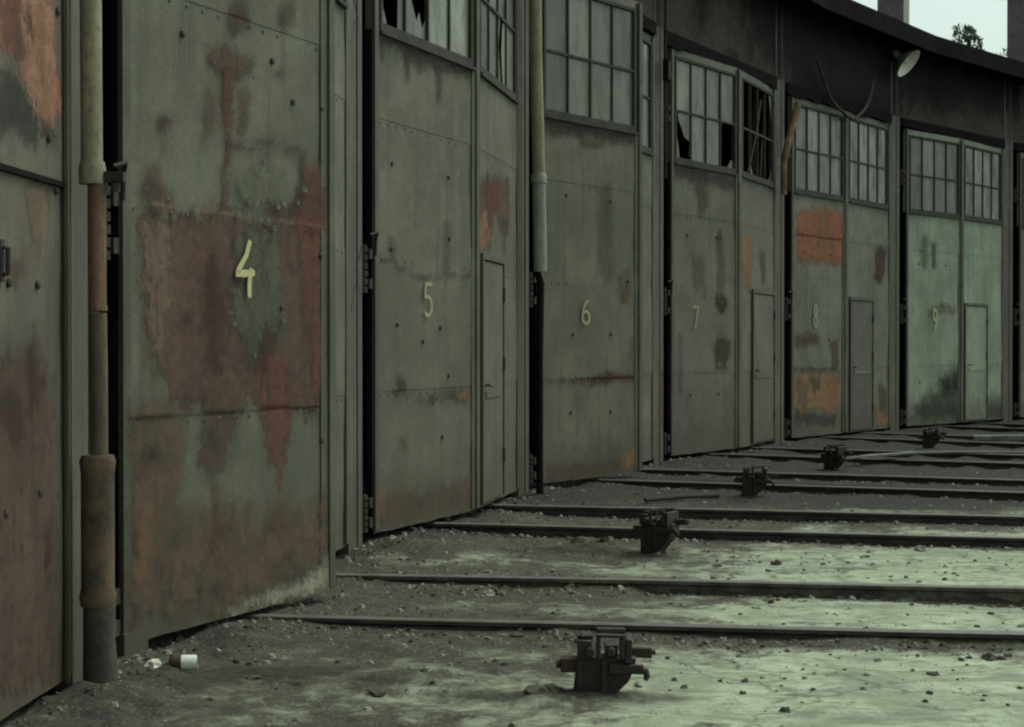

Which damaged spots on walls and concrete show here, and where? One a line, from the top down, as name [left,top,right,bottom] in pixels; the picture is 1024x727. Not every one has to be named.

rust [480,173,511,253]
rust [136,0,321,522]
rust [564,371,635,389]
rust [794,342,842,415]